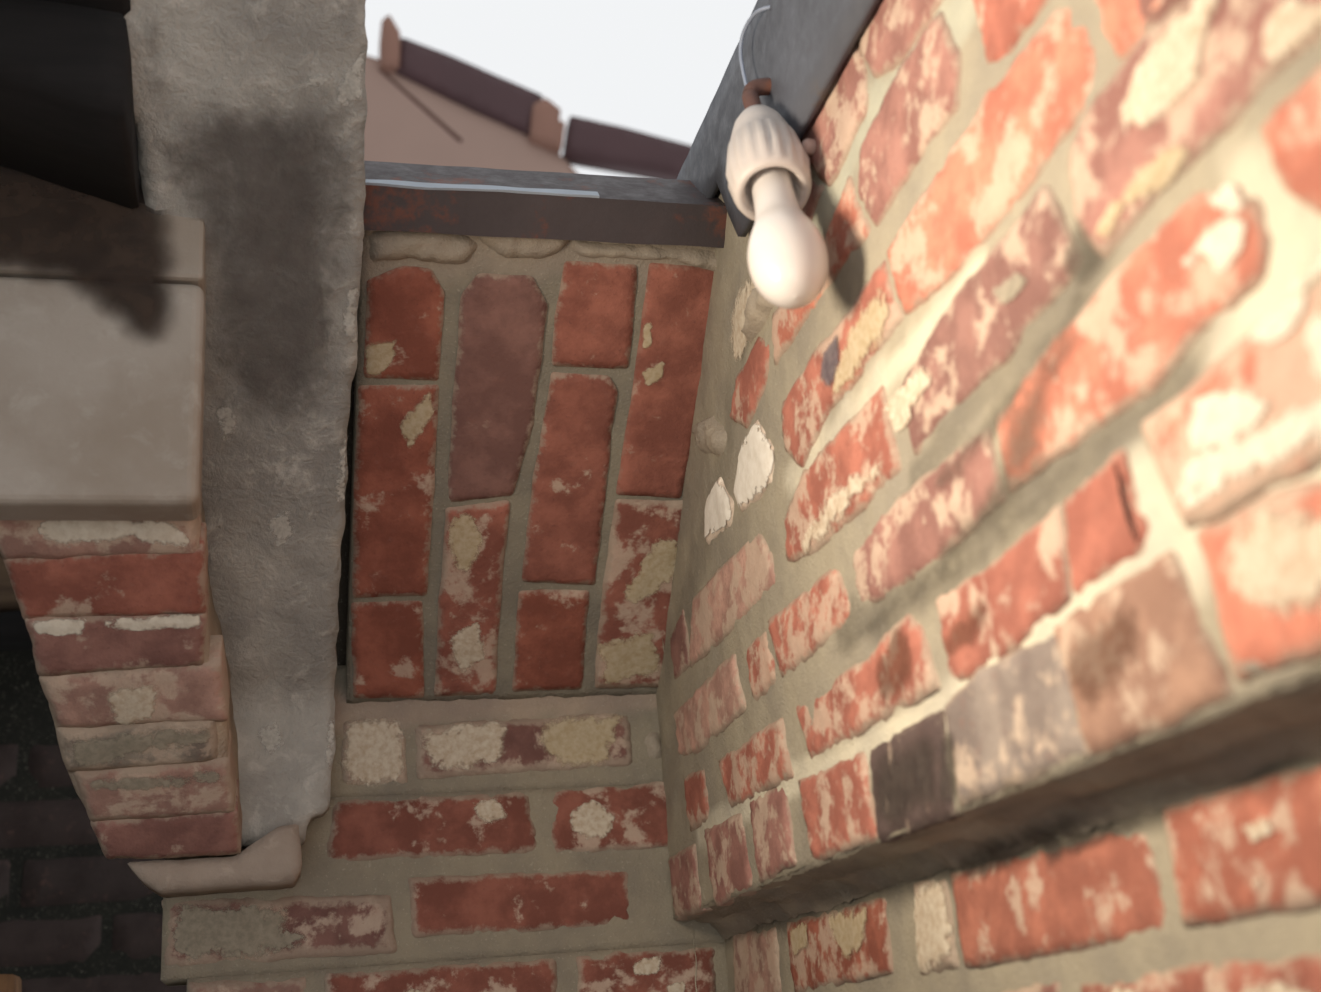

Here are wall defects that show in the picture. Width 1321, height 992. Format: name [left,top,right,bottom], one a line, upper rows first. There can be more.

damp [0,166,168,335]
damp [190,118,327,395]